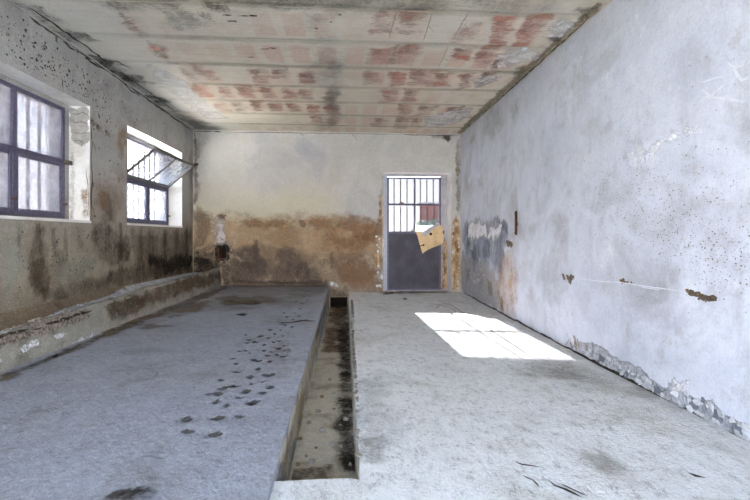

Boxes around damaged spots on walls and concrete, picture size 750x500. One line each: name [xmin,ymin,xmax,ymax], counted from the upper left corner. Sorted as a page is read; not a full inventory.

damp [25,5,220,130]
spalling [423,3,606,133]
peeling [69,106,110,146]
spalling [213,214,232,263]
damp [107,195,383,319]
damp [468,222,507,283]
spalling [0,272,199,348]
flaking render [575,341,750,441]